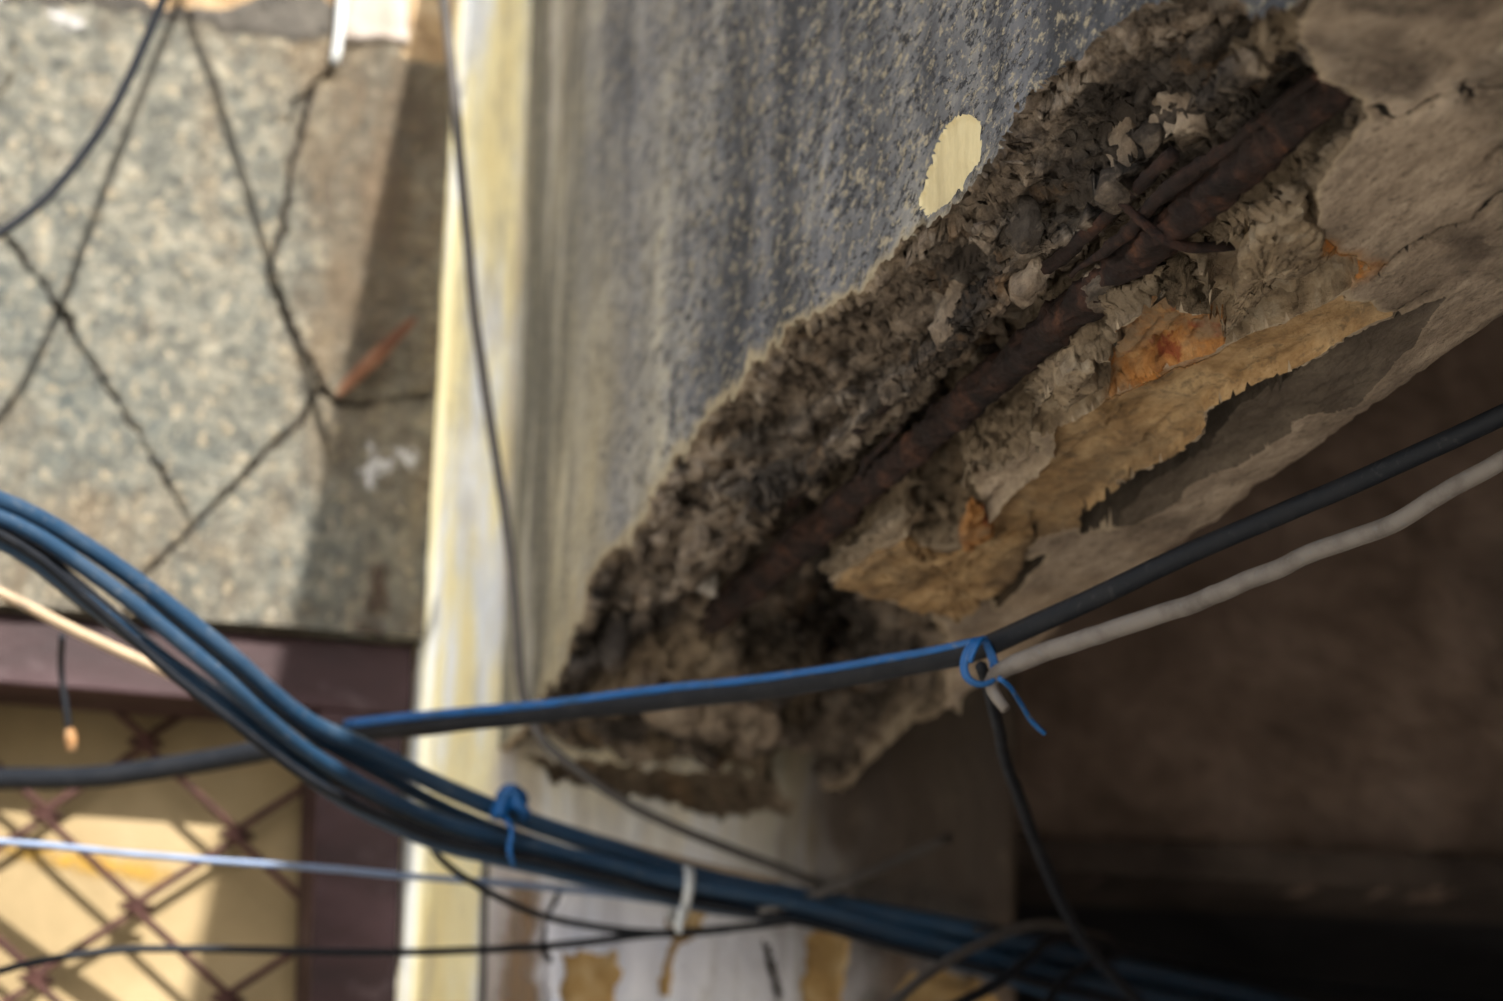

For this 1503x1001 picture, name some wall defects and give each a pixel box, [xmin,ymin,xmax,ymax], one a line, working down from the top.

crack [1372,82,1476,118]
crack [1378,190,1503,309]
crack [3,61,377,616]
spalling [542,0,1446,700]
spalling [511,669,950,823]
peeling [559,949,623,1001]
peeling [658,910,708,996]
peeling [799,930,850,1001]